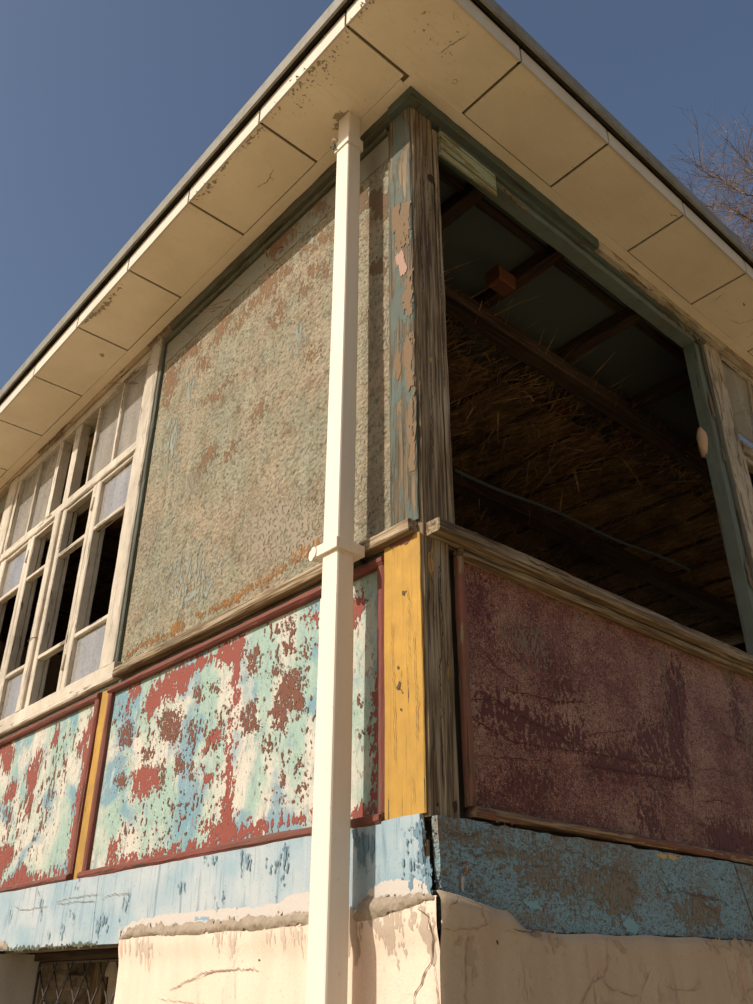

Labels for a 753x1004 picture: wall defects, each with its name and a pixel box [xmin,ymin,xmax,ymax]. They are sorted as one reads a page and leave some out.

peeling [136,508,164,567]
peeling [354,447,390,533]
peeling [354,583,369,630]
peeling [105,603,319,866]
peeling [351,671,377,819]
peeling [430,650,695,936]
crack [414,899,540,1004]
crack [445,828,701,1004]
crack [660,878,724,915]
peeling [653,877,753,942]